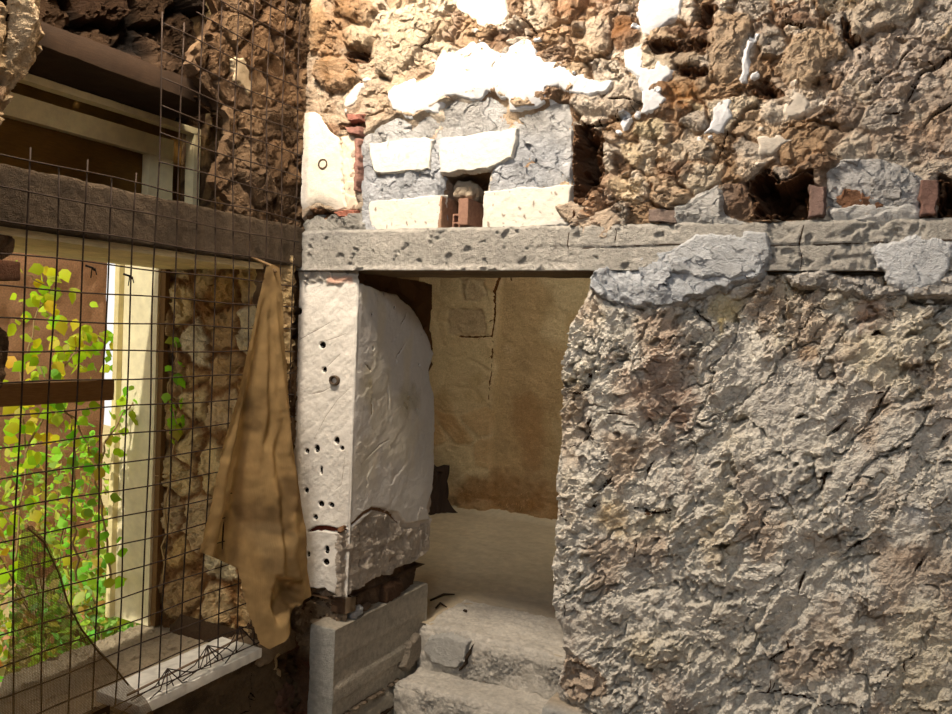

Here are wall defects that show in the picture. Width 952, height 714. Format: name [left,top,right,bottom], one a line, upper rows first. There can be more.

flaking render [388,0,612,120]
flaking render [616,0,718,136]
flaking render [739,33,828,121]
flaking render [301,78,371,220]
spalling [572,123,608,218]
spalling [748,127,814,221]
crack [459,278,512,399]
crack [570,412,627,447]
crack [827,387,890,436]
crack [634,507,672,516]
crack [815,472,829,498]
crack [759,641,862,708]